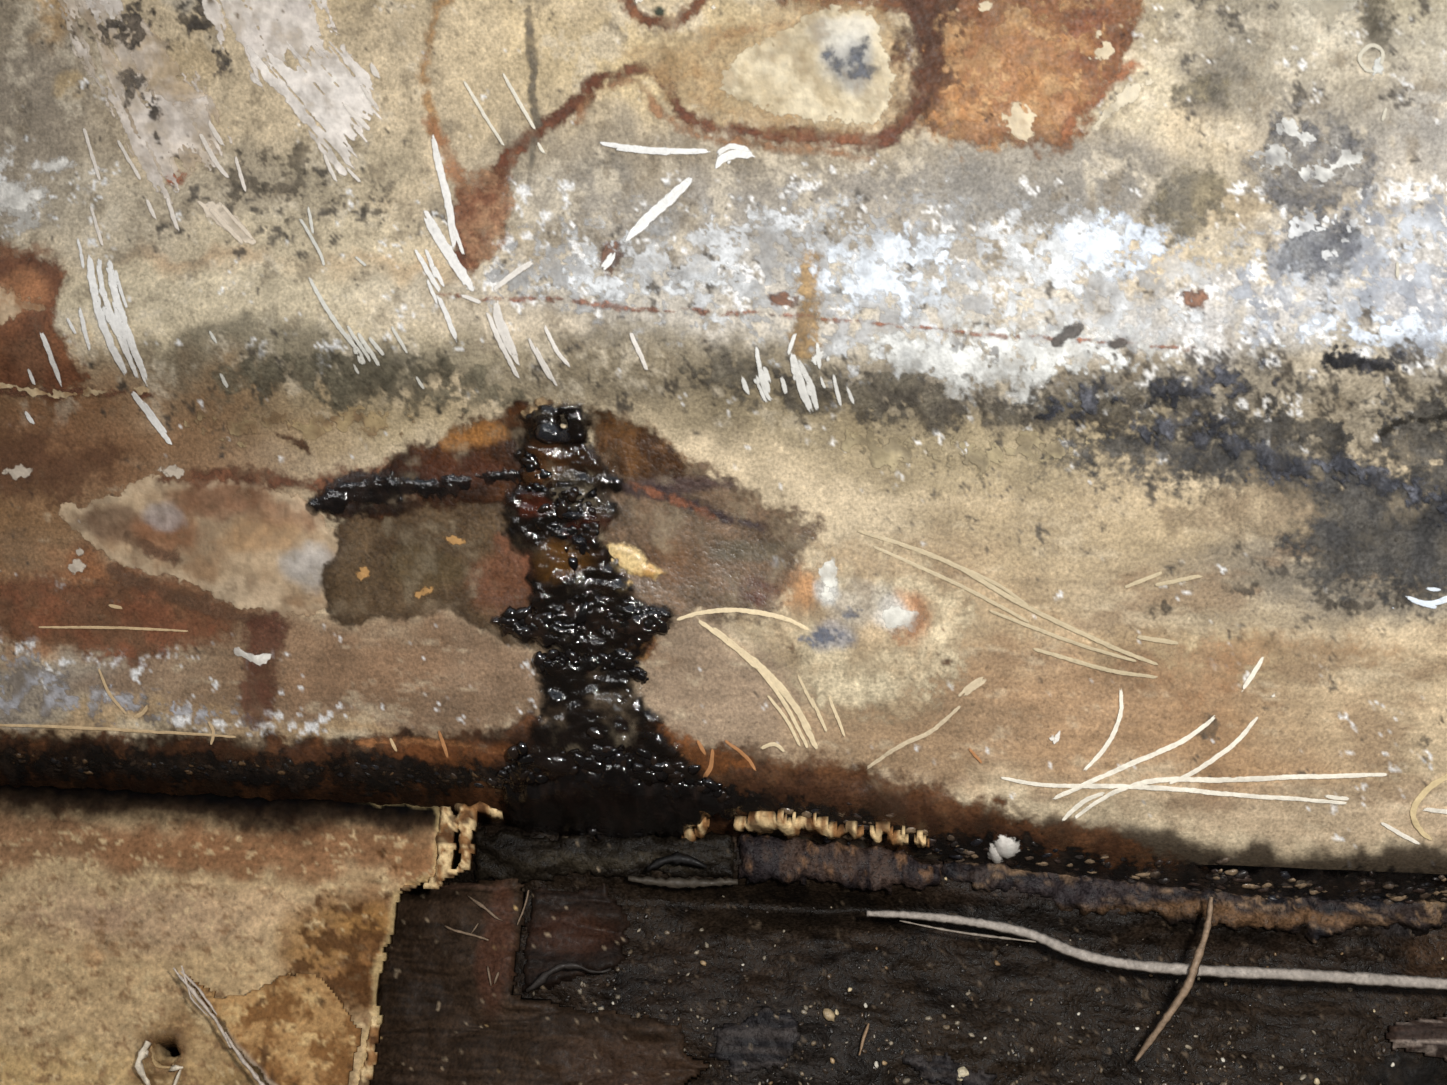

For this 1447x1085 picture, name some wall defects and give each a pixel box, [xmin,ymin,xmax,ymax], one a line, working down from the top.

corrosion [421,0,1143,274]
damp [1172,73,1228,107]
corrosion [0,242,90,401]
damp [485,102,1447,609]
corrosion [0,434,119,503]
corrosion [0,567,242,666]
damp [322,498,541,648]